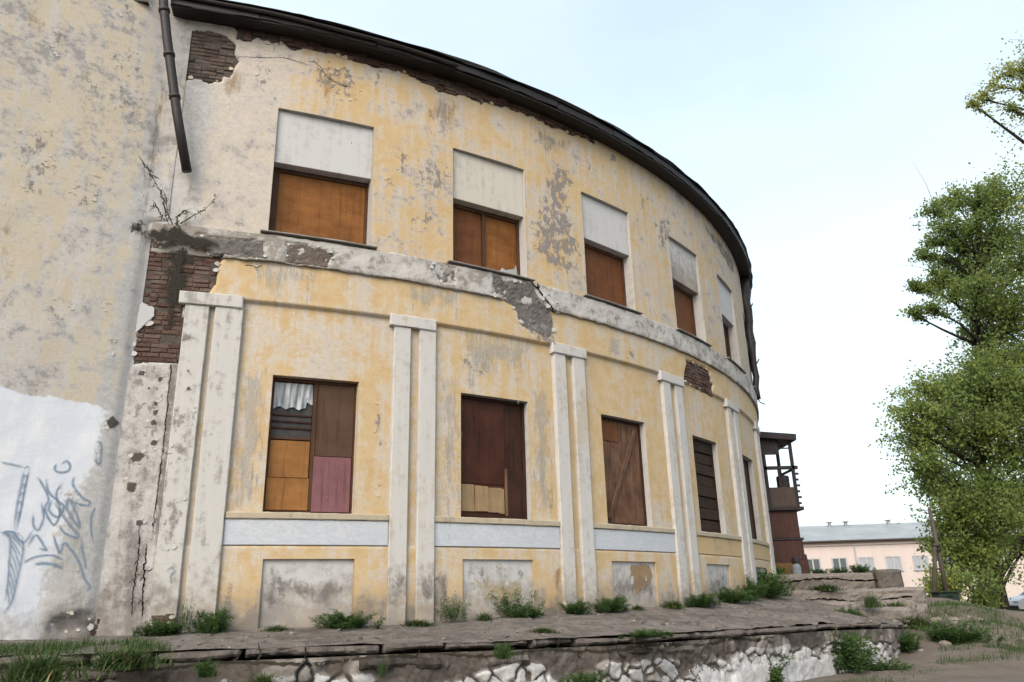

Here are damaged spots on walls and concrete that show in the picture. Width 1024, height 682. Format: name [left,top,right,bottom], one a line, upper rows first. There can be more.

crack [239,55,350,87]
flaking render [186,29,595,144]
peeling [529,161,580,274]
spalling [493,275,559,345]
flaking render [104,234,268,525]
flaking render [684,360,713,396]
crack [129,365,172,618]
peeling [630,564,652,594]